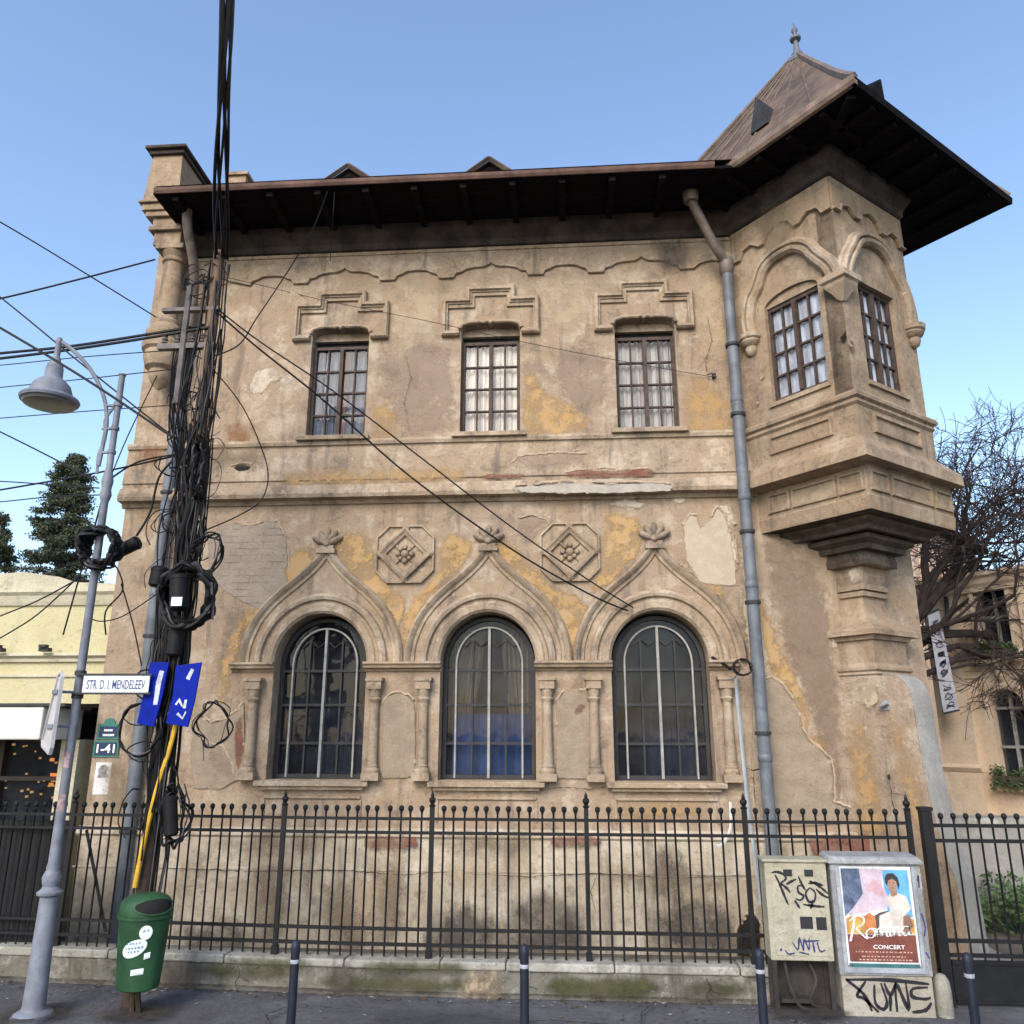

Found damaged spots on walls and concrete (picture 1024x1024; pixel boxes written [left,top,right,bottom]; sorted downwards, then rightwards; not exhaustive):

peeling [241,368,294,394]
peeling [523,364,588,434]
peeling [336,532,472,644]
flaking render [190,519,313,789]
flaking render [482,466,870,856]
damp [652,849,718,891]
damp [328,869,401,949]
damp [425,892,584,953]
damp [654,902,734,954]